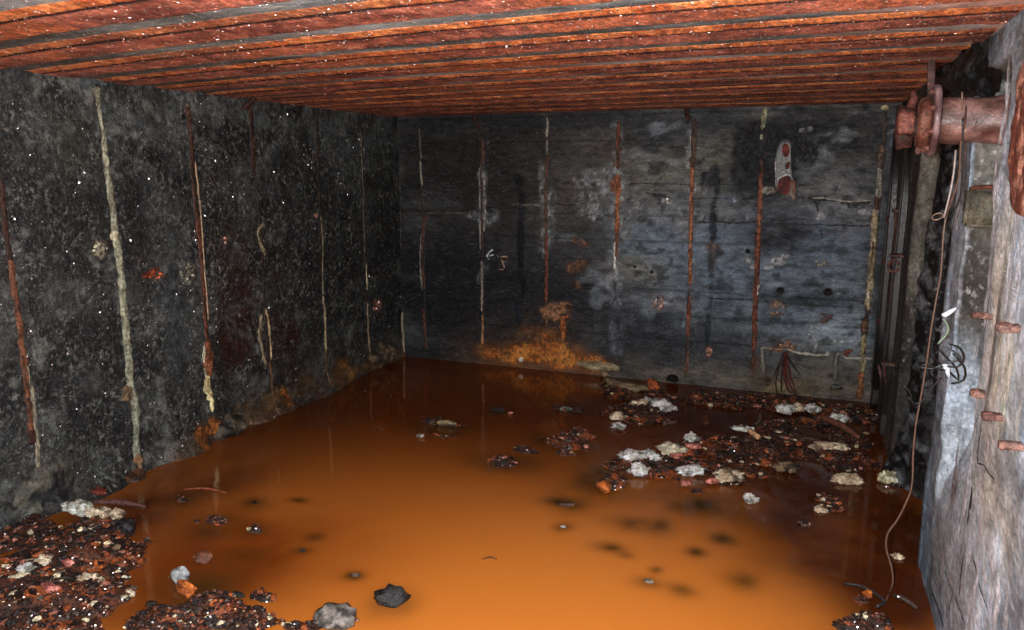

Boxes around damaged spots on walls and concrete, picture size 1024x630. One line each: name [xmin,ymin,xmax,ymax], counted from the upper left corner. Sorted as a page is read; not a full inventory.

corrosion [484,302,606,372]